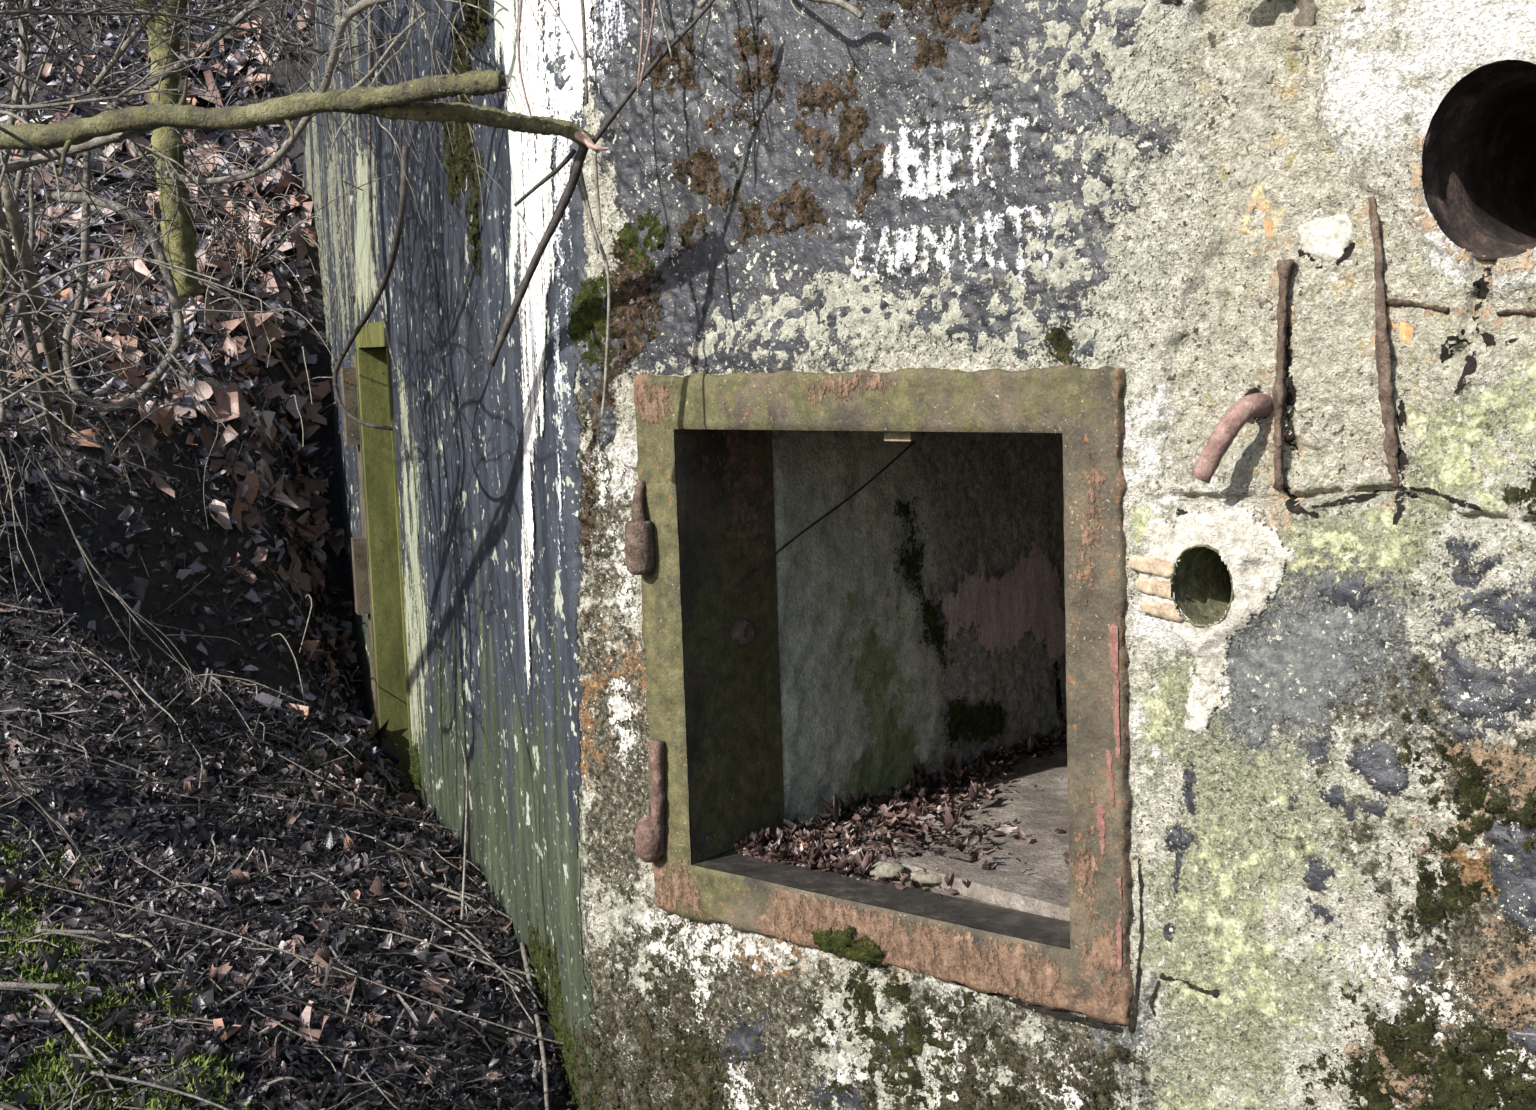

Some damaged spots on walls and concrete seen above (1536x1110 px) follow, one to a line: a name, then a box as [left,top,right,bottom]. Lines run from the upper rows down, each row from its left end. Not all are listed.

spalling [1144,0,1536,509]
rust [634,377,674,447]
rust [800,373,897,408]
crack [1439,261,1519,394]
peeling [303,0,1186,1110]
rust [1069,448,1112,606]
peeling [1214,522,1536,823]
rust [654,855,713,920]
rust [763,782,1122,1013]
water stain [1162,922,1177,941]
peeling [1341,921,1478,1053]
peeling [1483,810,1536,933]